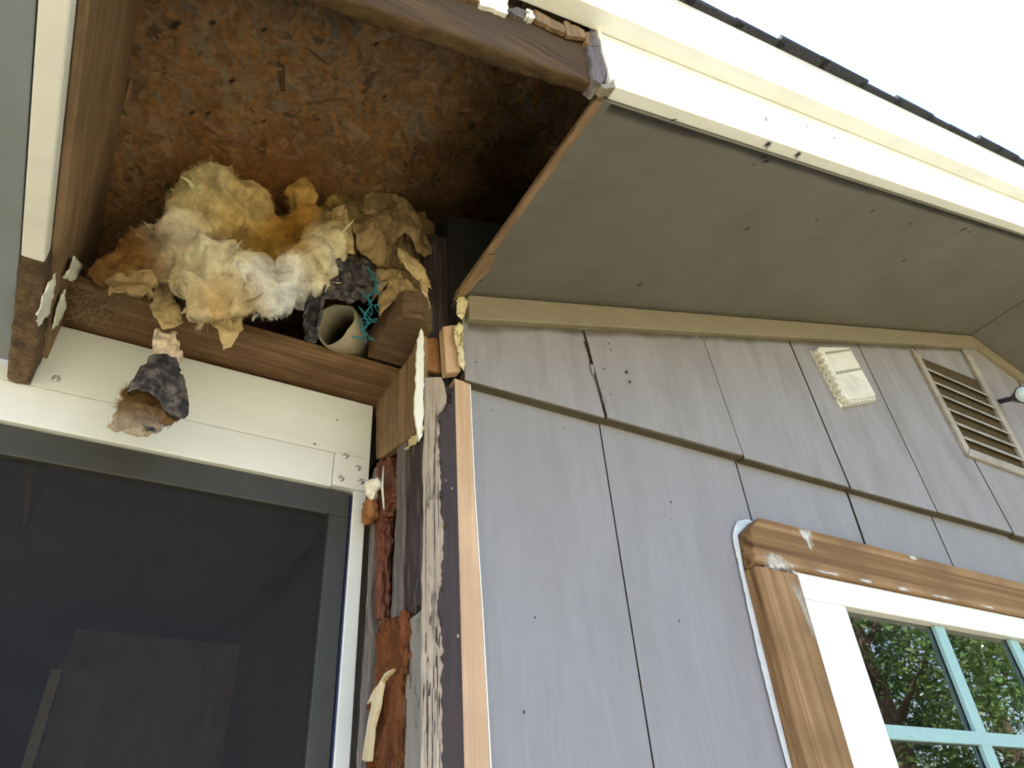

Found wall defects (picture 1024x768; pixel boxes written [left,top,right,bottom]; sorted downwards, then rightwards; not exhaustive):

peeling [35,256,83,329]
crack [584,341,608,414]
damp [371,456,397,621]
peeling [404,329,464,768]